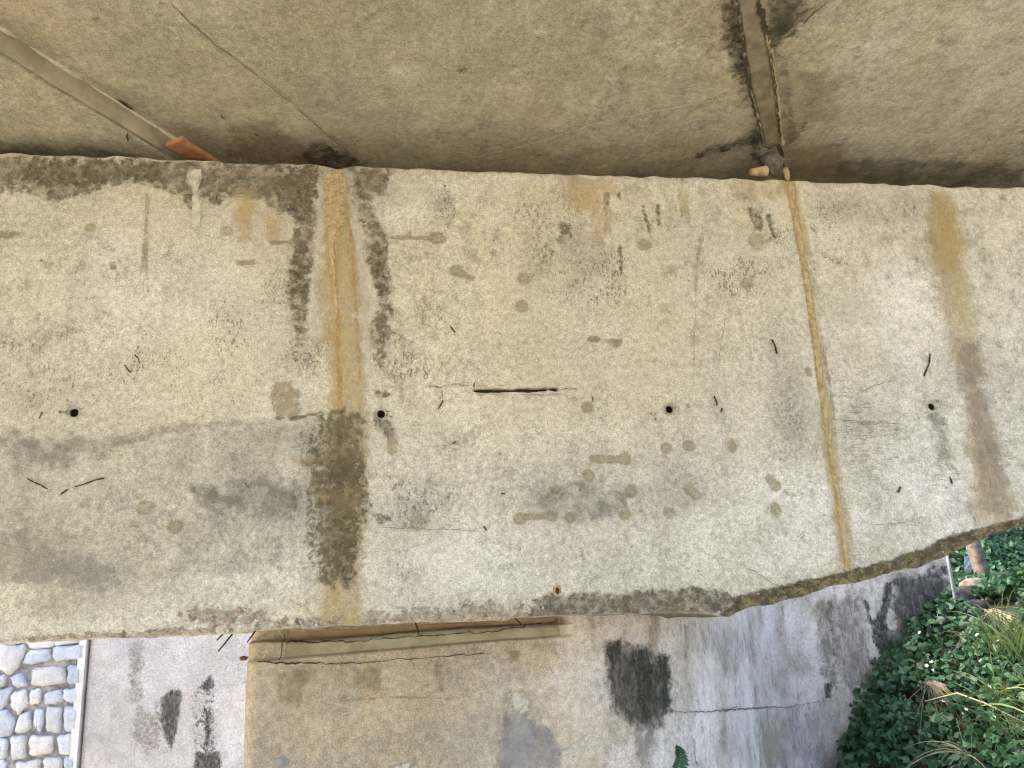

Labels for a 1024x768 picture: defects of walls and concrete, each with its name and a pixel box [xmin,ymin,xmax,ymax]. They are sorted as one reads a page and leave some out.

damp [721,0,745,85]
damp [768,0,827,57]
damp [695,130,762,160]
damp [0,144,430,378]
corrosion [318,194,365,627]
crack [430,383,580,399]
corrosion [932,195,1013,517]
damp [209,382,397,590]
crack [258,619,557,665]
damp [604,638,672,768]